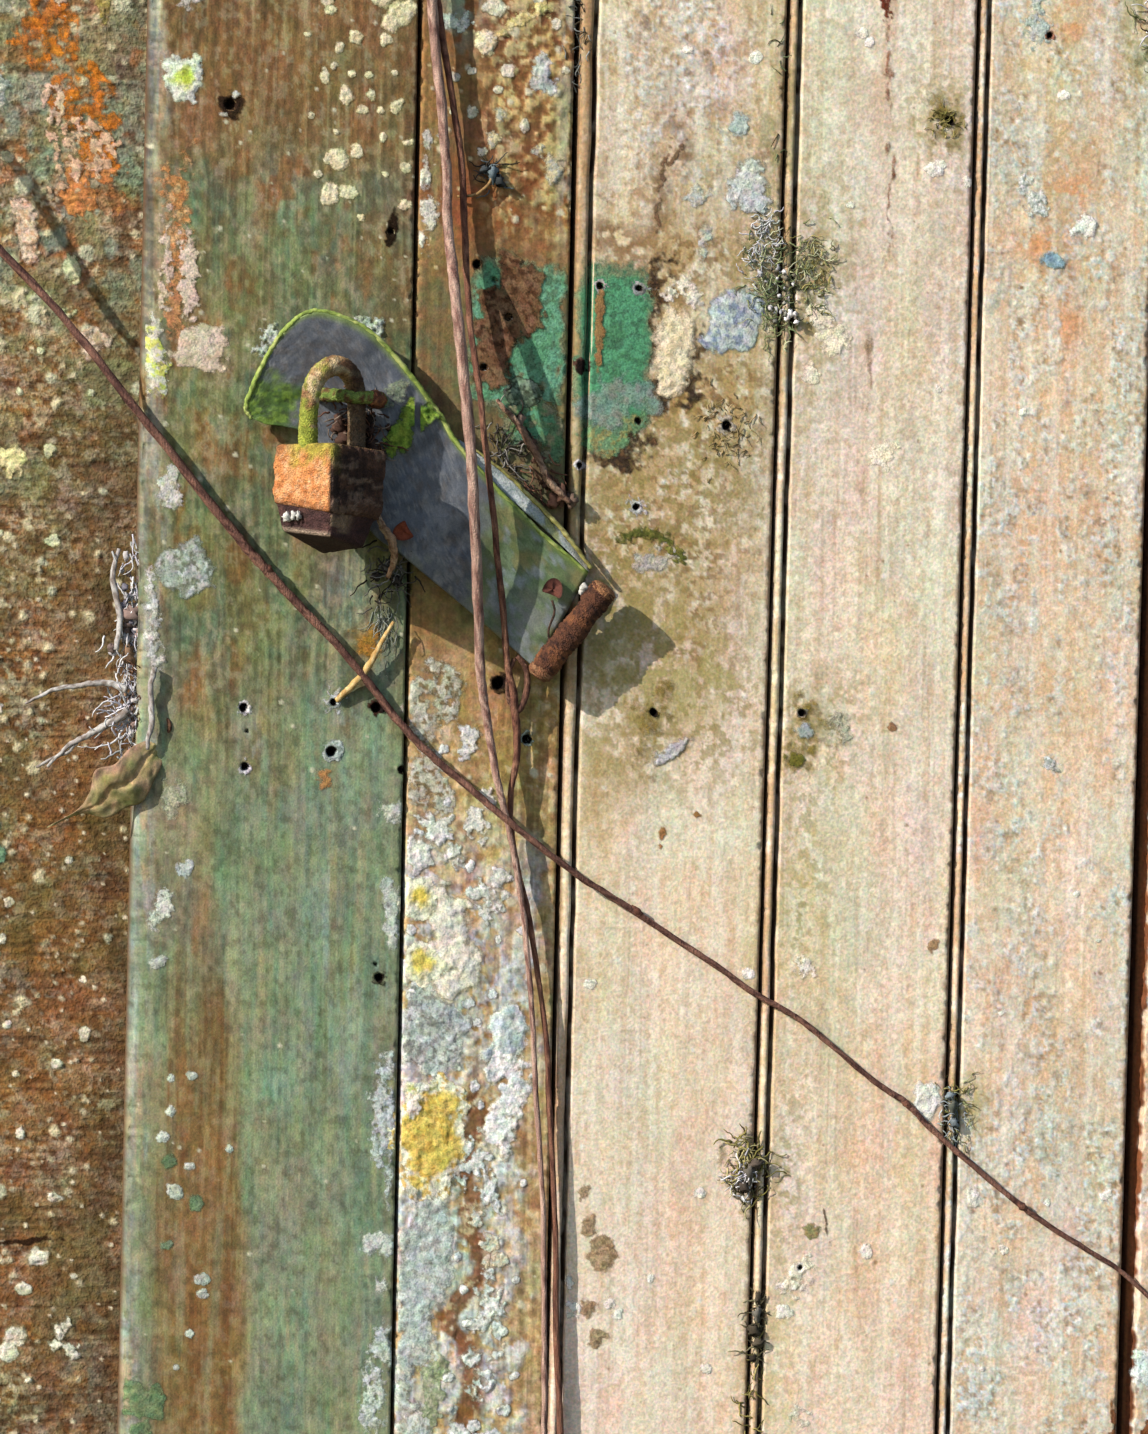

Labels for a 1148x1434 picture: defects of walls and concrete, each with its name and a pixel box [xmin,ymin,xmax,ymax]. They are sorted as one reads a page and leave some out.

peeling [467,248,664,469]